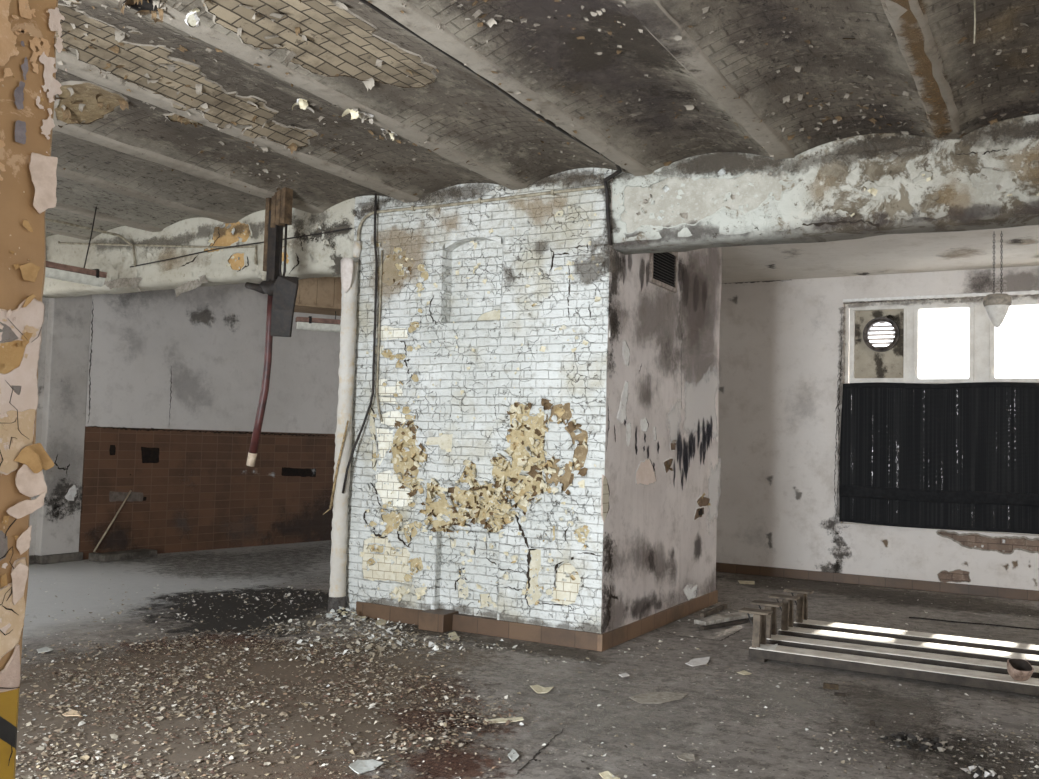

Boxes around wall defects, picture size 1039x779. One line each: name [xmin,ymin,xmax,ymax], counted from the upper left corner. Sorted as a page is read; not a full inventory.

flaking render [451,0,643,55]
damp [557,0,698,73]
damp [660,133,938,178]
damp [962,100,1039,145]
crack [0,380,29,466]
peeling [0,298,45,475]
peeling [361,378,592,609]
crack [454,497,618,626]
damp [624,402,720,522]
damp [820,308,896,573]
flaking render [936,530,1039,555]
peeling [0,524,674,779]